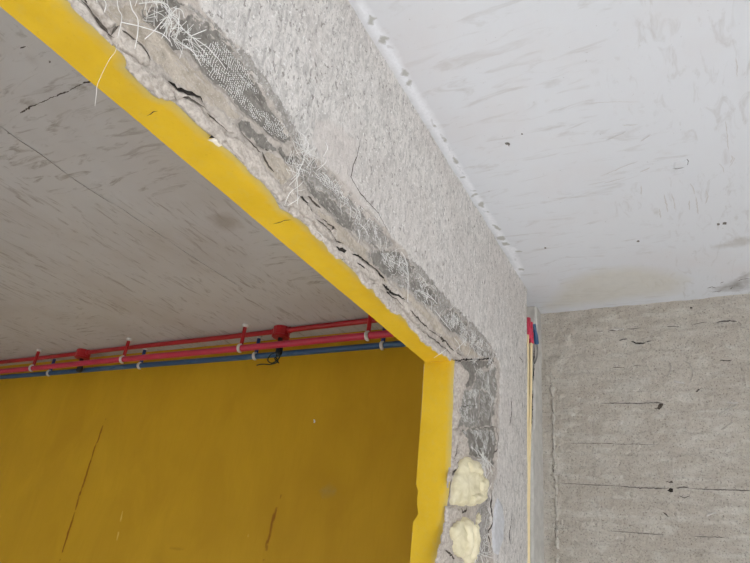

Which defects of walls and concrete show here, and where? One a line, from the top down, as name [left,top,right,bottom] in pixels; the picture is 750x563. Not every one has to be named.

crack [20,81,90,113]
crack [351,138,389,232]
spalling [67,0,499,488]
crack [602,399,662,407]
peeling [435,505,462,563]
spalling [476,490,491,563]
crack [552,450,750,538]